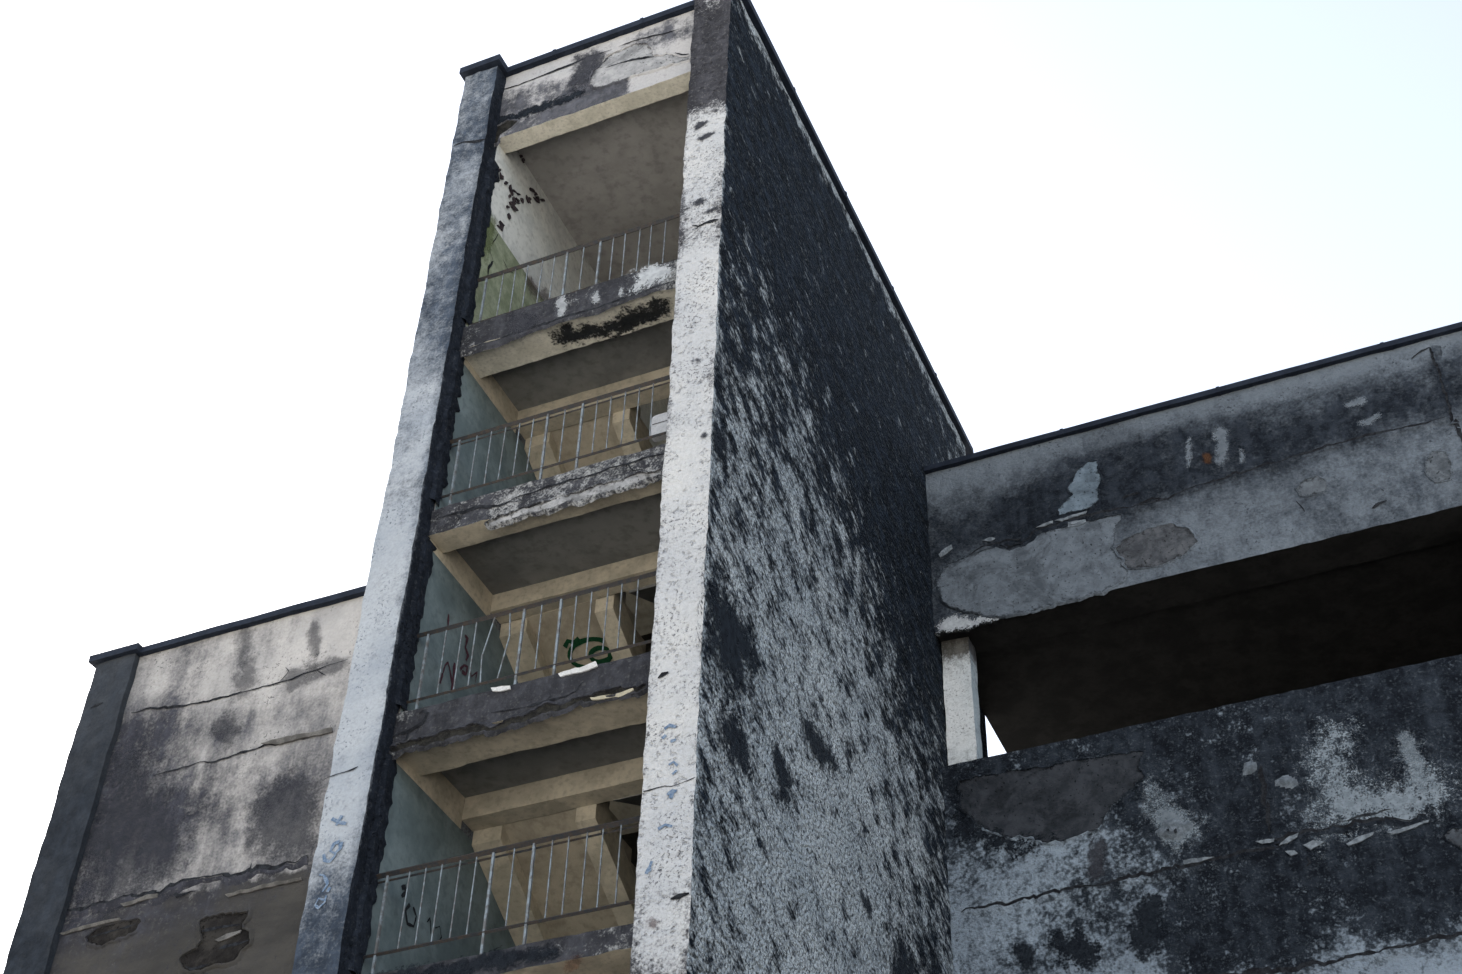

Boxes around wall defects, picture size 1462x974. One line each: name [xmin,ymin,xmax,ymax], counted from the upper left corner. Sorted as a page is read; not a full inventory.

spalling [547,292,673,347]
leakage [701,421,728,462]
crack [947,345,1462,569]
spalling [933,460,1200,619]
crack [91,659,347,713]
peeling [558,661,598,678]
leakage [696,557,794,815]
crack [154,738,307,776]
leakage [799,709,839,778]
leakage [245,776,319,861]
spalling [348,671,668,974]
crack [961,809,1425,917]